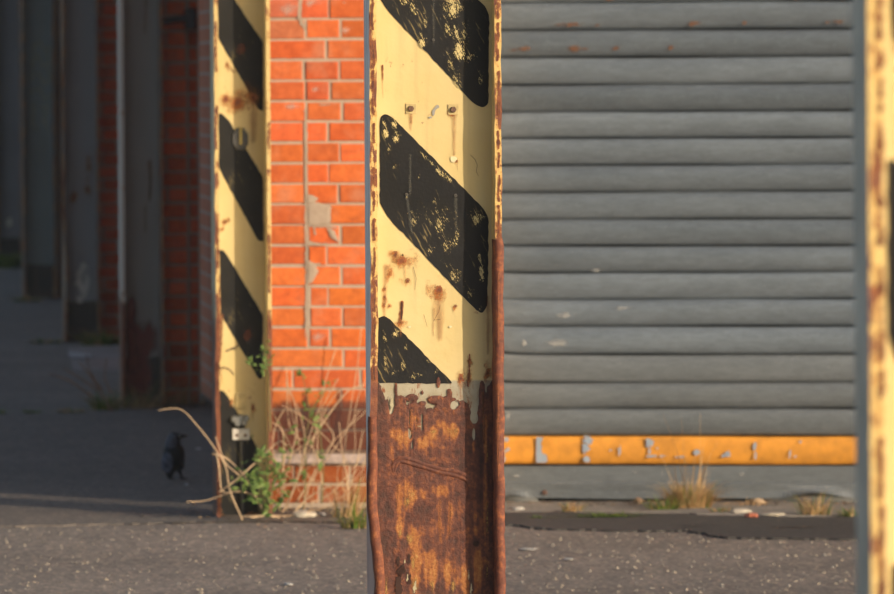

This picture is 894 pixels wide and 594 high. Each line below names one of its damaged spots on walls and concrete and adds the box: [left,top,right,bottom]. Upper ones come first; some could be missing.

rust [369,0,384,144]
peeling [442,0,478,87]
rust [875,0,885,114]
rust [214,91,259,150]
spalling [307,194,340,246]
peeling [411,199,460,254]
rust [213,293,233,515]
rust [372,131,506,594]
peeling [536,436,550,463]
peeling [582,435,593,462]
peeling [646,438,700,458]
rust [878,437,887,594]